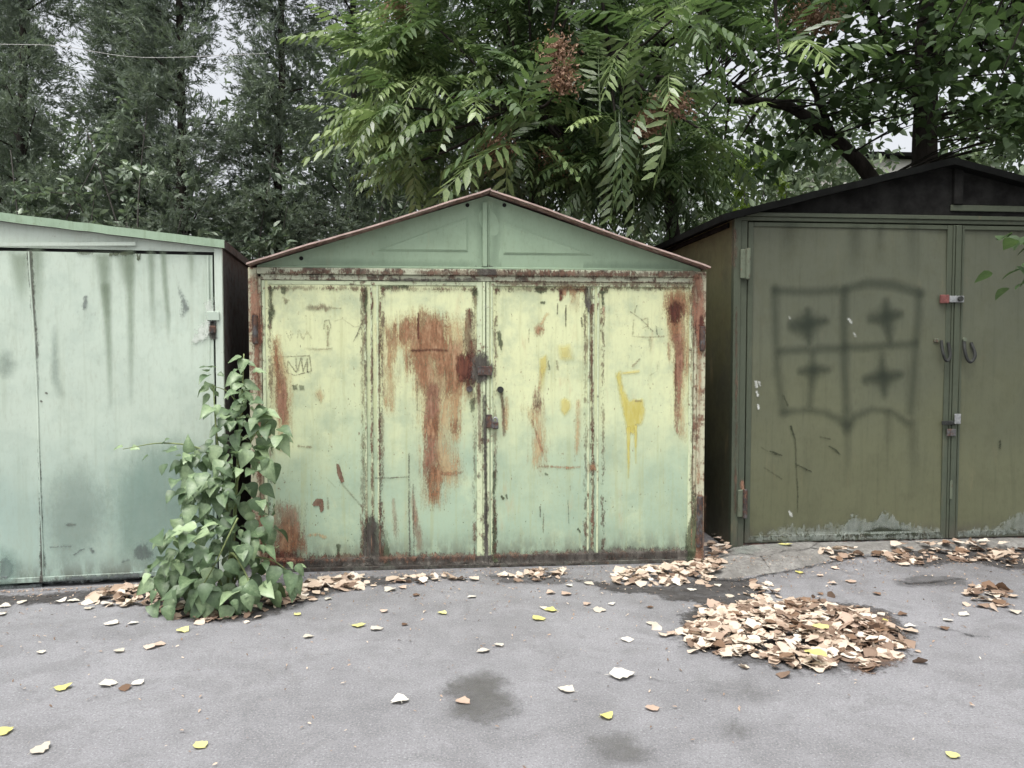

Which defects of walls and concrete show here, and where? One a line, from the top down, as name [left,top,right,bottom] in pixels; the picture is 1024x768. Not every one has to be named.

corrosion [250,265,706,566]
peeling [864,527,918,536]